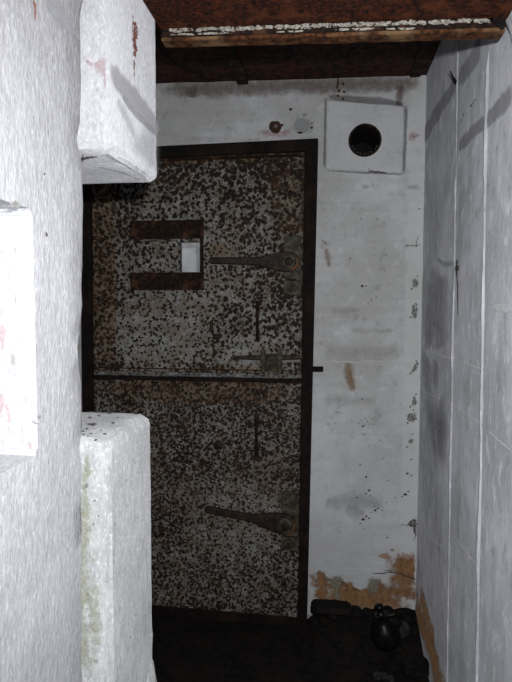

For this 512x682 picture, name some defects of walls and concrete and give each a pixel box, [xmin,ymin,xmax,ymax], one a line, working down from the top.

corrosion [311,558,444,682]